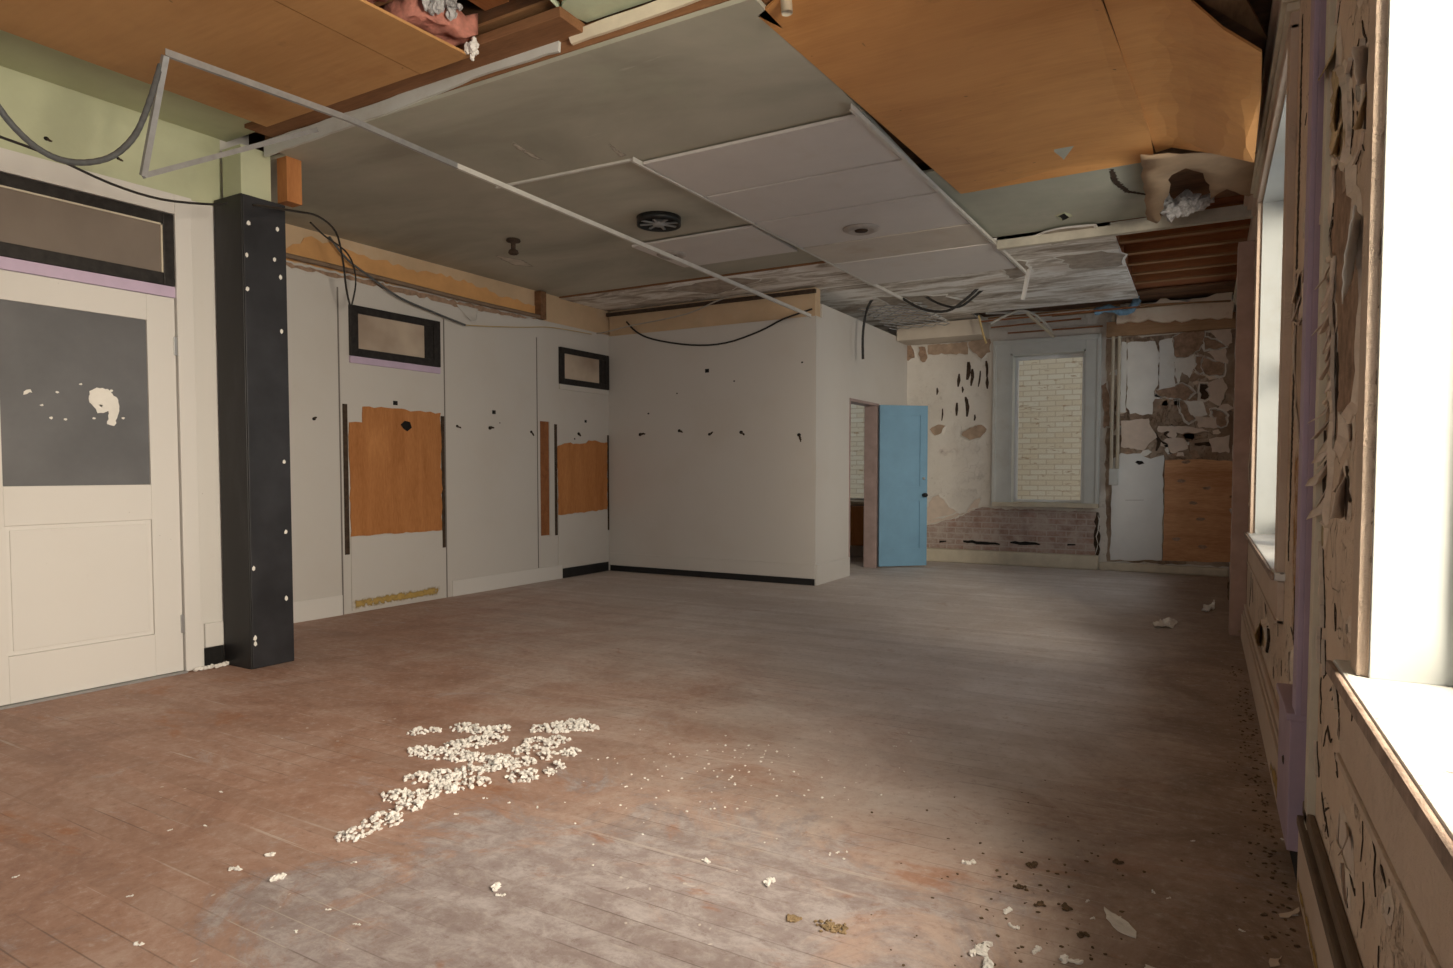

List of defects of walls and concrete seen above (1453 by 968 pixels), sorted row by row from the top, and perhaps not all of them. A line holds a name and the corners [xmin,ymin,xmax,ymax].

peeling [1318,23,1369,133]
peeling [665,277,762,295]
peeling [871,294,975,311]
peeling [1002,259,1034,279]
peeling [1033,212,1128,270]
flaking render [1291,153,1363,550]
flaking render [927,327,1254,568]
peeling [1336,805,1354,915]